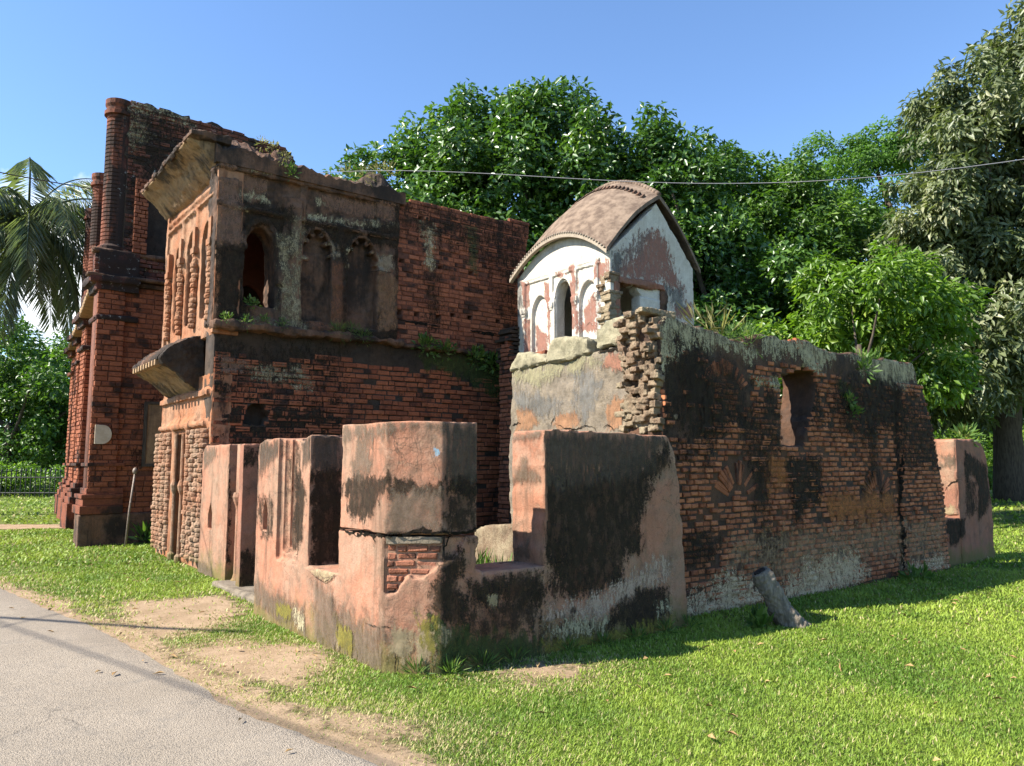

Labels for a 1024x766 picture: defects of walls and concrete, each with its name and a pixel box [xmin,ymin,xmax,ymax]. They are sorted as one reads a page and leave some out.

flaking render [521,227,694,352]
flaking render [602,352,622,373]
damp [203,196,991,676]
flaking render [386,535,445,593]
crack [899,445,907,569]